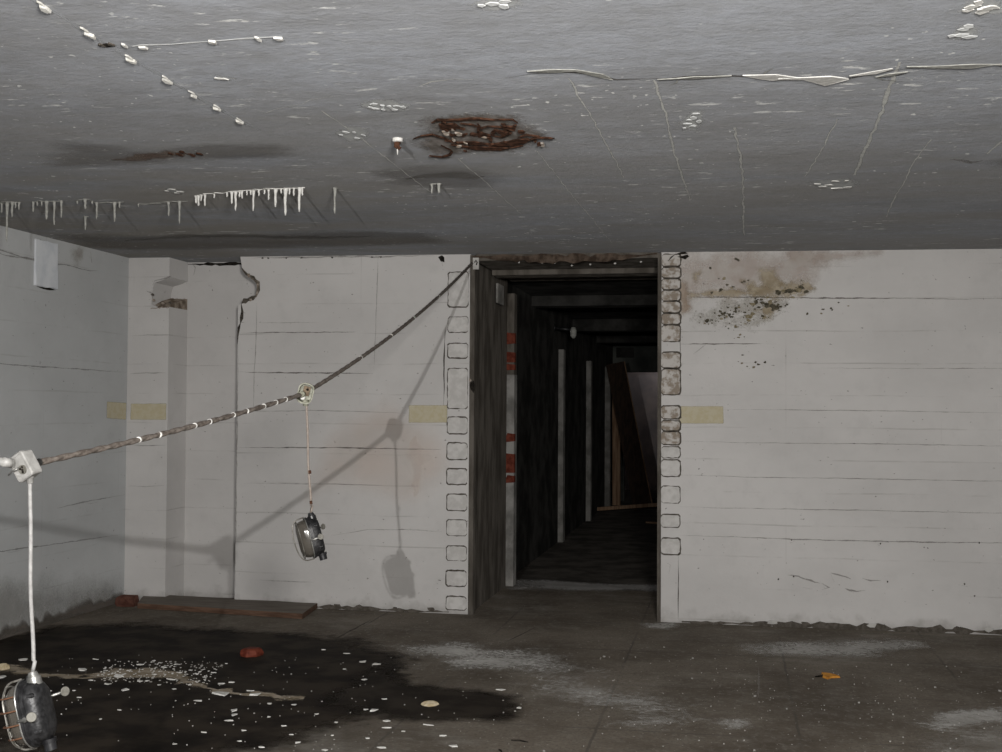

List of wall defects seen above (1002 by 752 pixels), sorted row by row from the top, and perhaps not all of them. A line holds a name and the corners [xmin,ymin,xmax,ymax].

crack [514,69,629,177]
crack [653,62,1002,201]
crack [237,304,331,344]
water stain [680,269,813,339]
water stain [0,594,123,640]